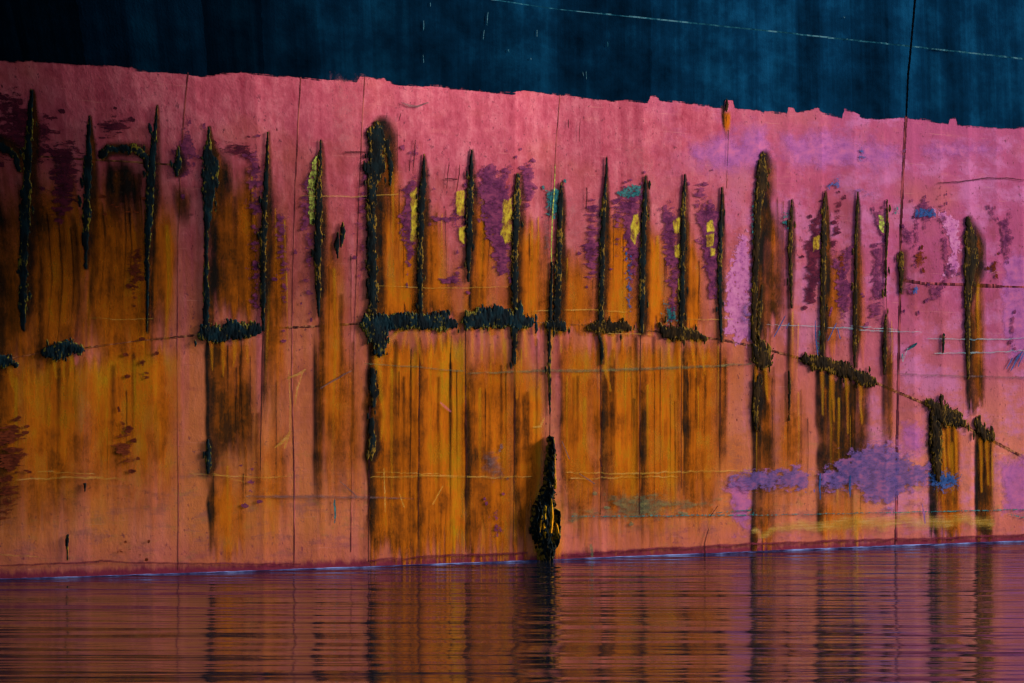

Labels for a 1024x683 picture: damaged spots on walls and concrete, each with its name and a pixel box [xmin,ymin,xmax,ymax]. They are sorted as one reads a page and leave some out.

corrosion [0,89,288,559]
corrosion [311,117,726,566]
corrosion [750,151,907,551]
corrosion [925,216,995,544]